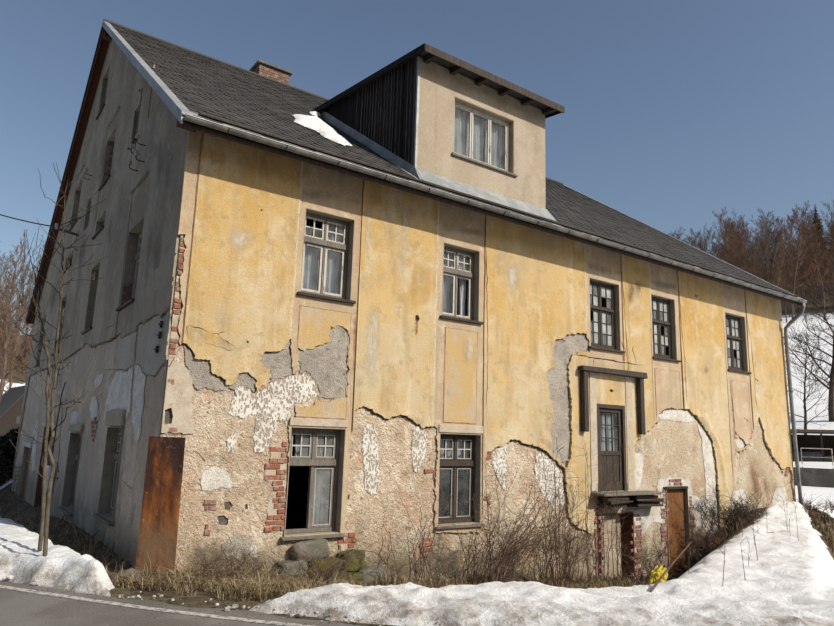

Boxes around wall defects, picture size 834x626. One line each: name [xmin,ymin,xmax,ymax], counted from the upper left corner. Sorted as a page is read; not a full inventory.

corrosion [135,436,185,578]
flaking render [12,235,350,577]
flaking render [323,333,719,580]
flaking render [729,418,793,515]